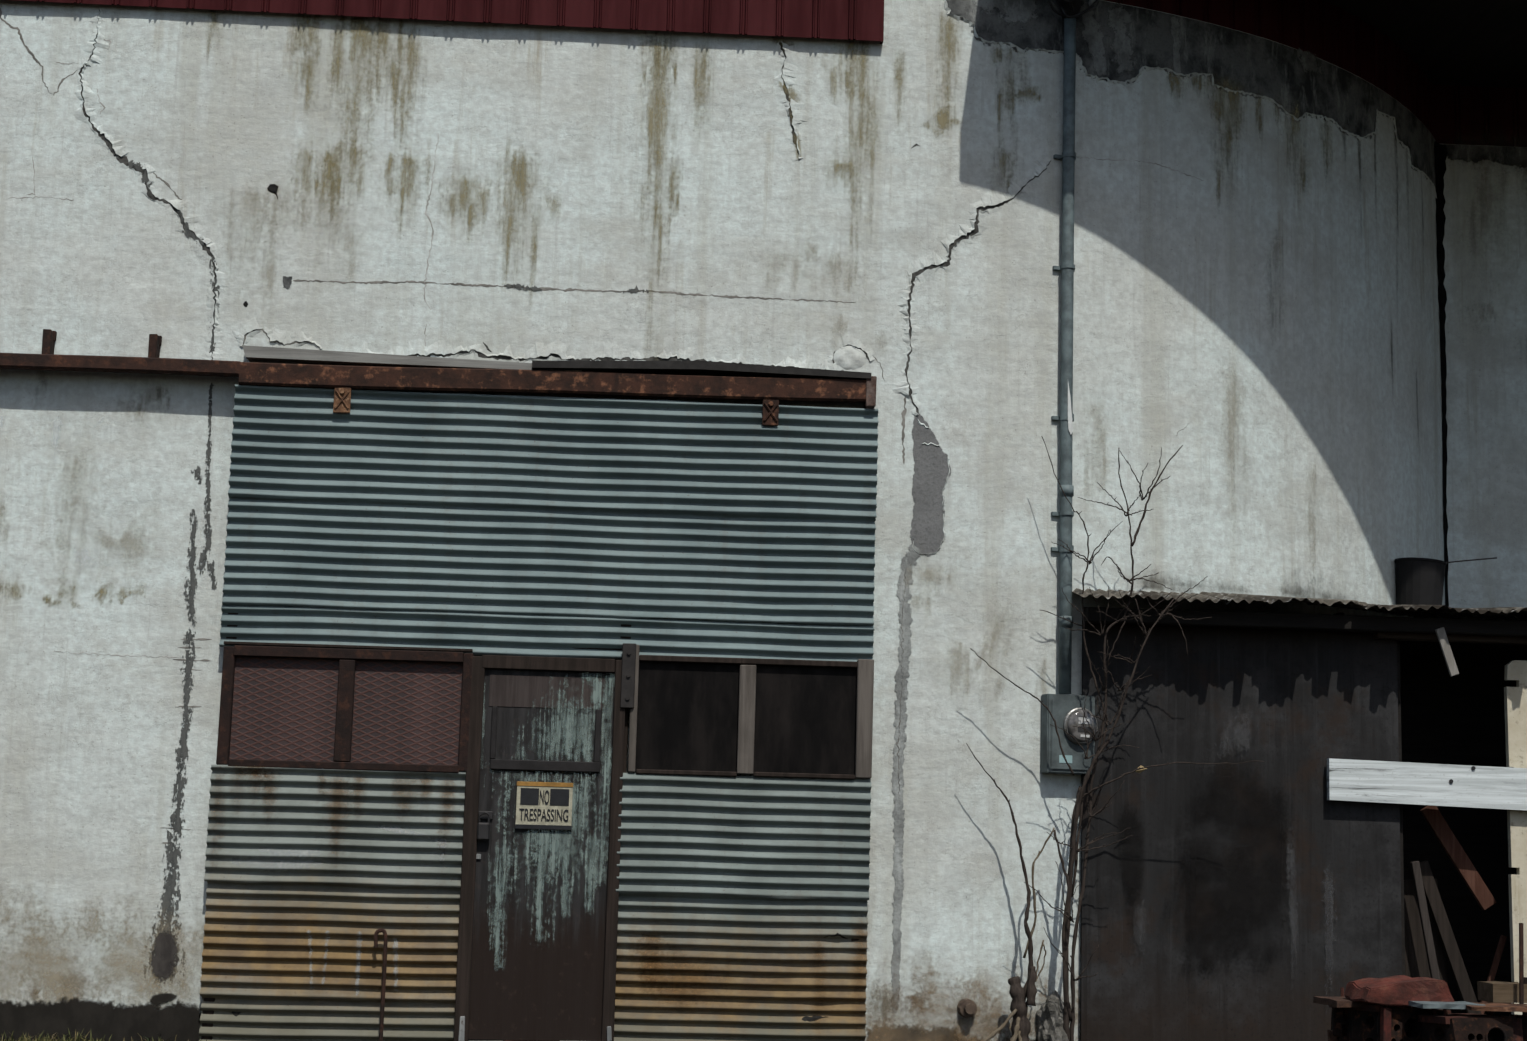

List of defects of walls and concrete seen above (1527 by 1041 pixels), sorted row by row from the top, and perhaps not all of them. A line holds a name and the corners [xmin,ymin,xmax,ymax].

crack [0,7,322,361]
leakage [304,147,362,210]
leakage [332,16,418,127]
leakage [387,155,414,213]
leakage [504,155,527,273]
crack [283,135,854,371]
leakage [644,40,679,245]
crack [891,156,1204,463]
flaking render [944,0,1527,200]
peeling [487,672,615,967]
leakage [0,910,203,1041]
rust [374,928,388,1041]